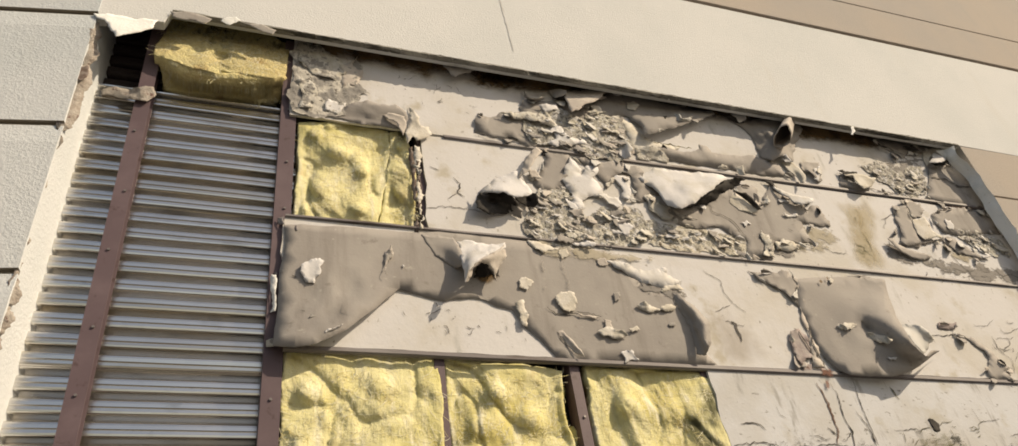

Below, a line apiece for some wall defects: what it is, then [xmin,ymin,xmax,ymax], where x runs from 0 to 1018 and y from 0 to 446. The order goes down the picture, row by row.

spalling [170,11,276,35]
peeling [286,42,432,144]
peeling [273,89,1018,383]
crack [884,214,1018,282]
crack [980,320,1018,373]
crack [734,328,878,446]
crack [903,415,1017,446]